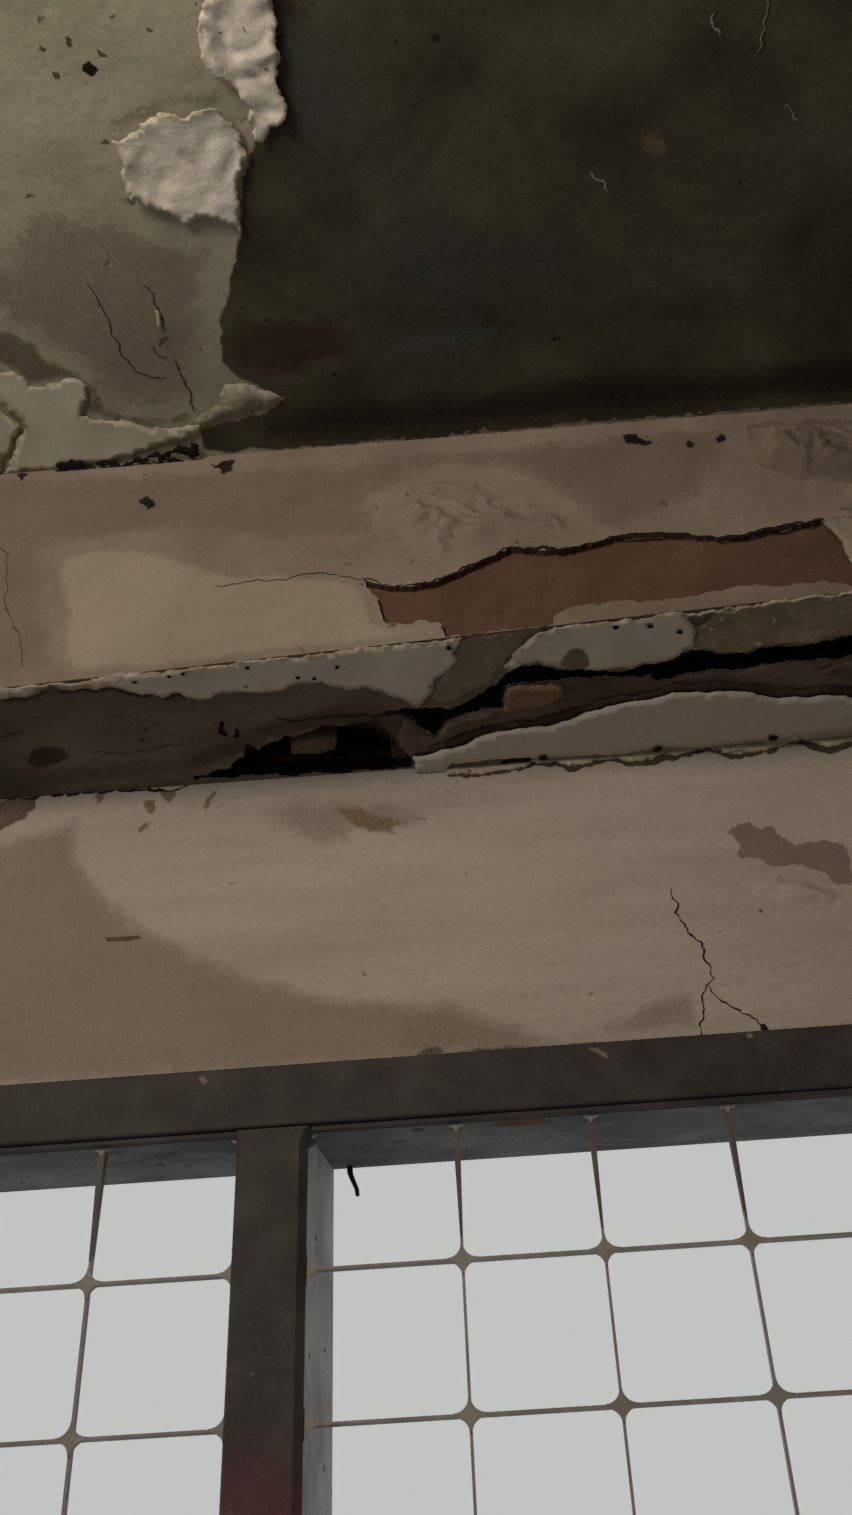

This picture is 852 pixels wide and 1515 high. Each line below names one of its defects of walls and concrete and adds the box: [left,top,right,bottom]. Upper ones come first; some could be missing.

crack [710,14,721,35]
crack [757,0,769,52]
spalling [0,0,852,474]
crack [590,171,608,191]
crack [86,284,195,412]
spalling [0,516,852,773]
peeling [0,797,39,830]
peeling [727,822,852,885]
leakage [0,813,698,1085]
crack [670,889,764,1035]